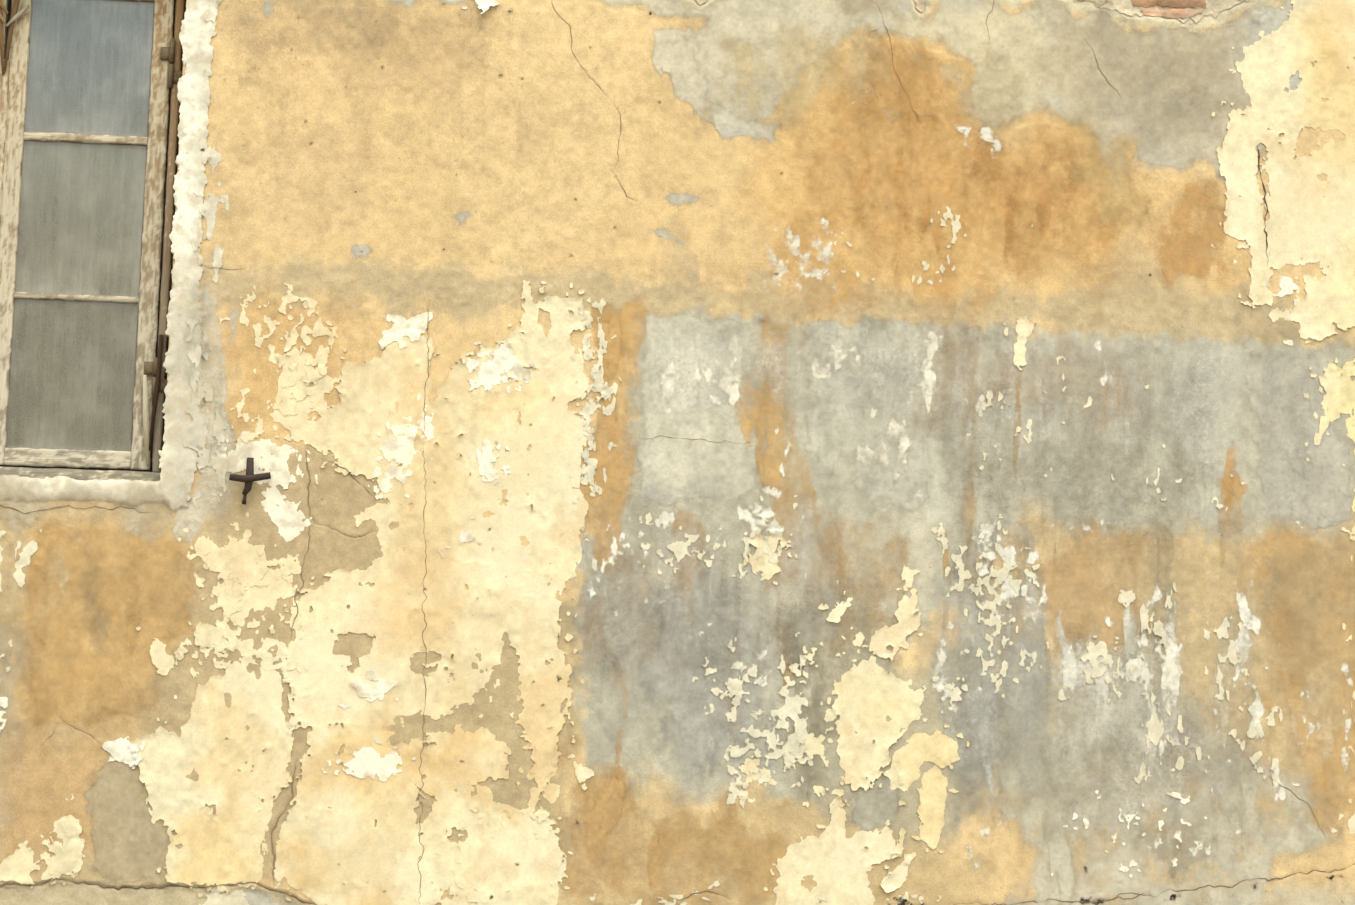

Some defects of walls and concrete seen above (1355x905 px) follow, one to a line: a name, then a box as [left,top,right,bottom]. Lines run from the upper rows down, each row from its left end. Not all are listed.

flaking render [1074,0,1249,23]
peeling [1211,0,1355,346]
peeling [1003,316,1036,371]
flaking render [636,312,764,526]
peeling [1304,356,1355,466]
peeling [0,529,42,592]
peeling [102,280,622,905]
peeling [641,517,798,585]
leakage [556,302,1355,905]
peeling [0,794,85,888]
crack [0,766,317,905]
crack [953,863,1355,905]